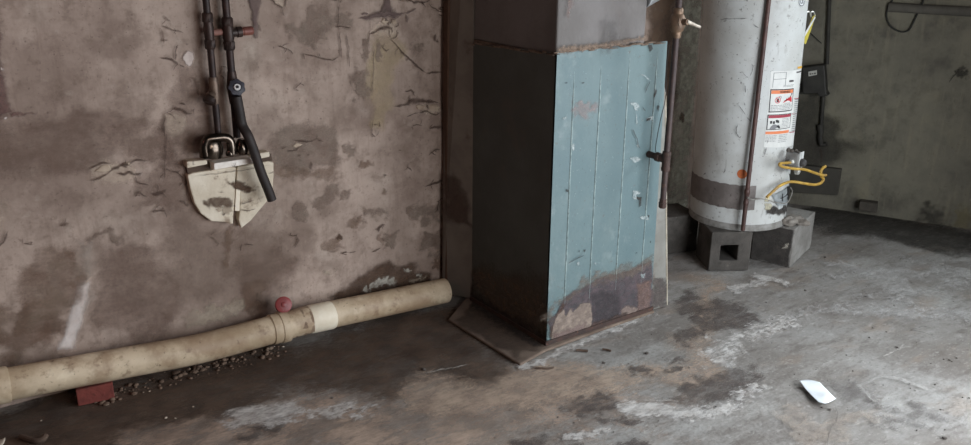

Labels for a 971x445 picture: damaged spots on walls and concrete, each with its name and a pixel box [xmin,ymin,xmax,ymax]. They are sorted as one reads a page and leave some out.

crack [90,19,199,217]
crack [282,138,321,167]
crack [279,0,443,155]
damp [517,272,860,445]